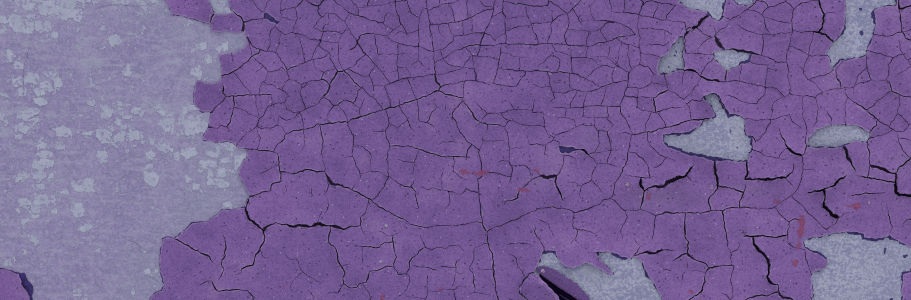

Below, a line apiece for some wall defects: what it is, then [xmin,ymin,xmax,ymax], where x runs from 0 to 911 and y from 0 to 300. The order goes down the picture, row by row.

peeling [0,0,296,300]
crack [208,0,911,300]
peeling [637,0,911,173]
crack [176,225,254,300]
peeling [519,250,662,300]
peeling [754,231,911,300]